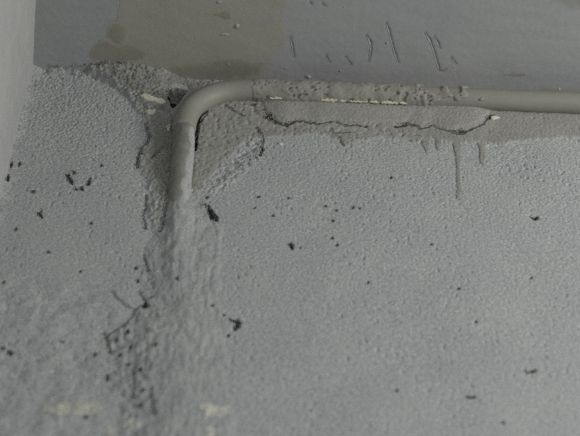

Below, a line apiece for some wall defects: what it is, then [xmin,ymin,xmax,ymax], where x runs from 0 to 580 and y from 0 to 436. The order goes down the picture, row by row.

crack [256,111,367,156]
crack [395,116,489,135]